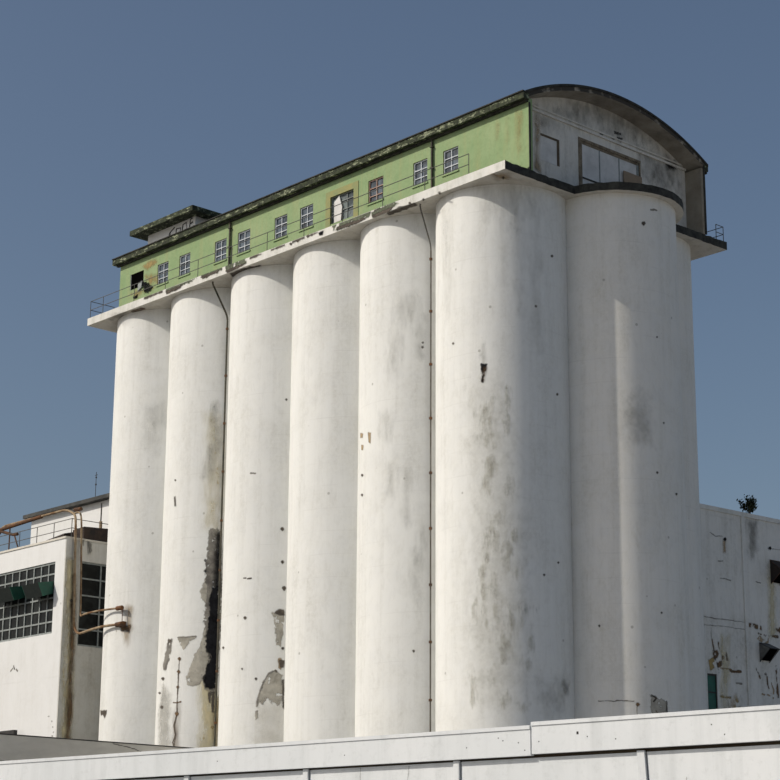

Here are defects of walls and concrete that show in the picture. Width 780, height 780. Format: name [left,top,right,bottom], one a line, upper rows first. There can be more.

corrosion [62,560,76,738]
spalling [161,528,224,712]
water stain [200,682,218,748]
peeling [255,609,284,719]
spalling [651,695,668,713]
peeling [709,639,728,670]